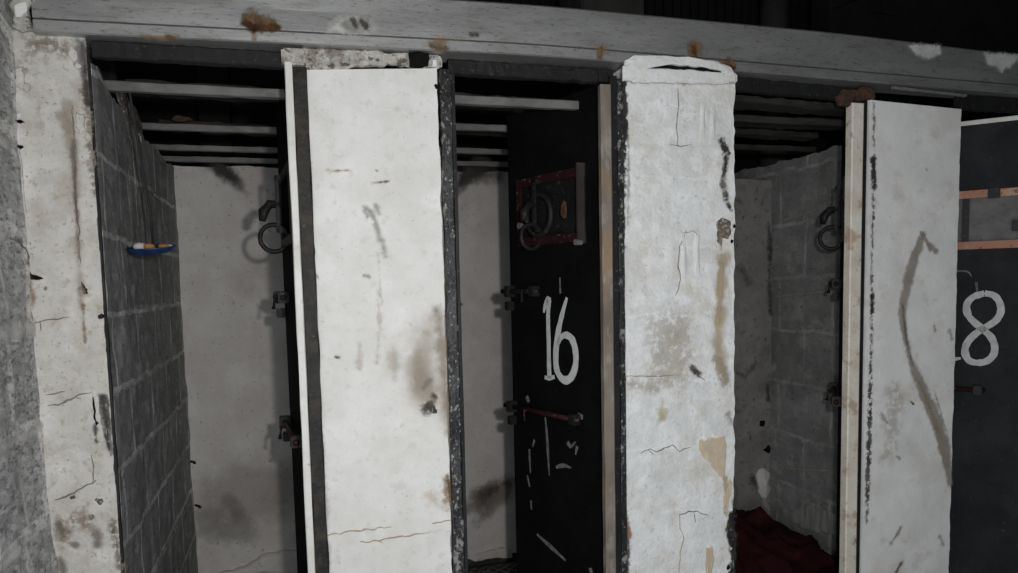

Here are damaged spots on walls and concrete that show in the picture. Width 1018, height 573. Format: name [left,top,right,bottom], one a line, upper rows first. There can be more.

corrosion [241,9,281,40]
corrosion [687,41,702,58]
peeling [910,45,941,59]
peeling [985,53,1018,72]
water stain [713,255,728,385]
water stain [422,393,448,414]
crack [641,445,691,455]
peeling [699,434,738,573]
crack [328,519,452,543]